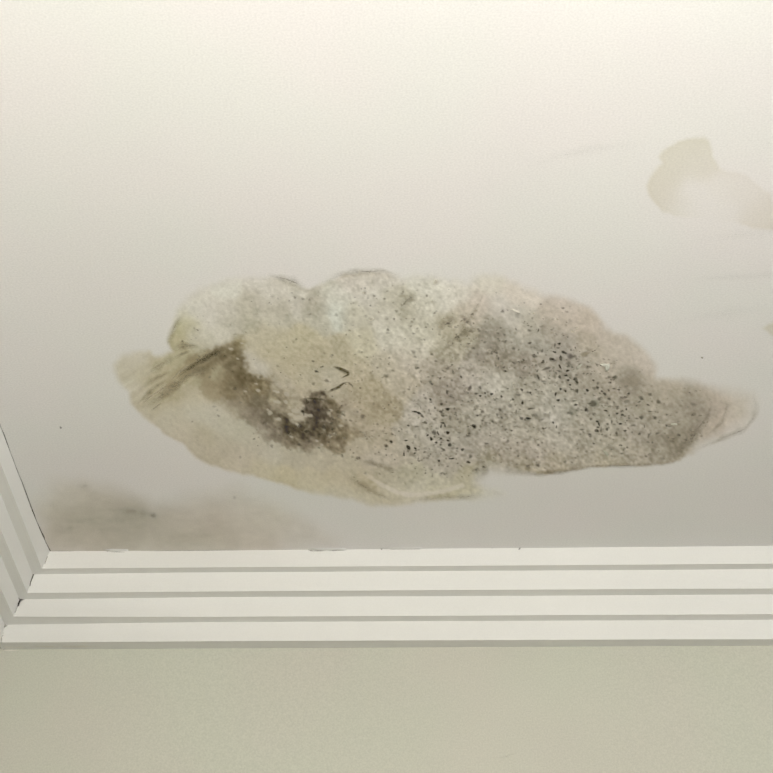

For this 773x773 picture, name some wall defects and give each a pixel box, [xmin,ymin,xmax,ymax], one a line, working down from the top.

leakage [643,133,773,233]
leakage [27,266,764,551]